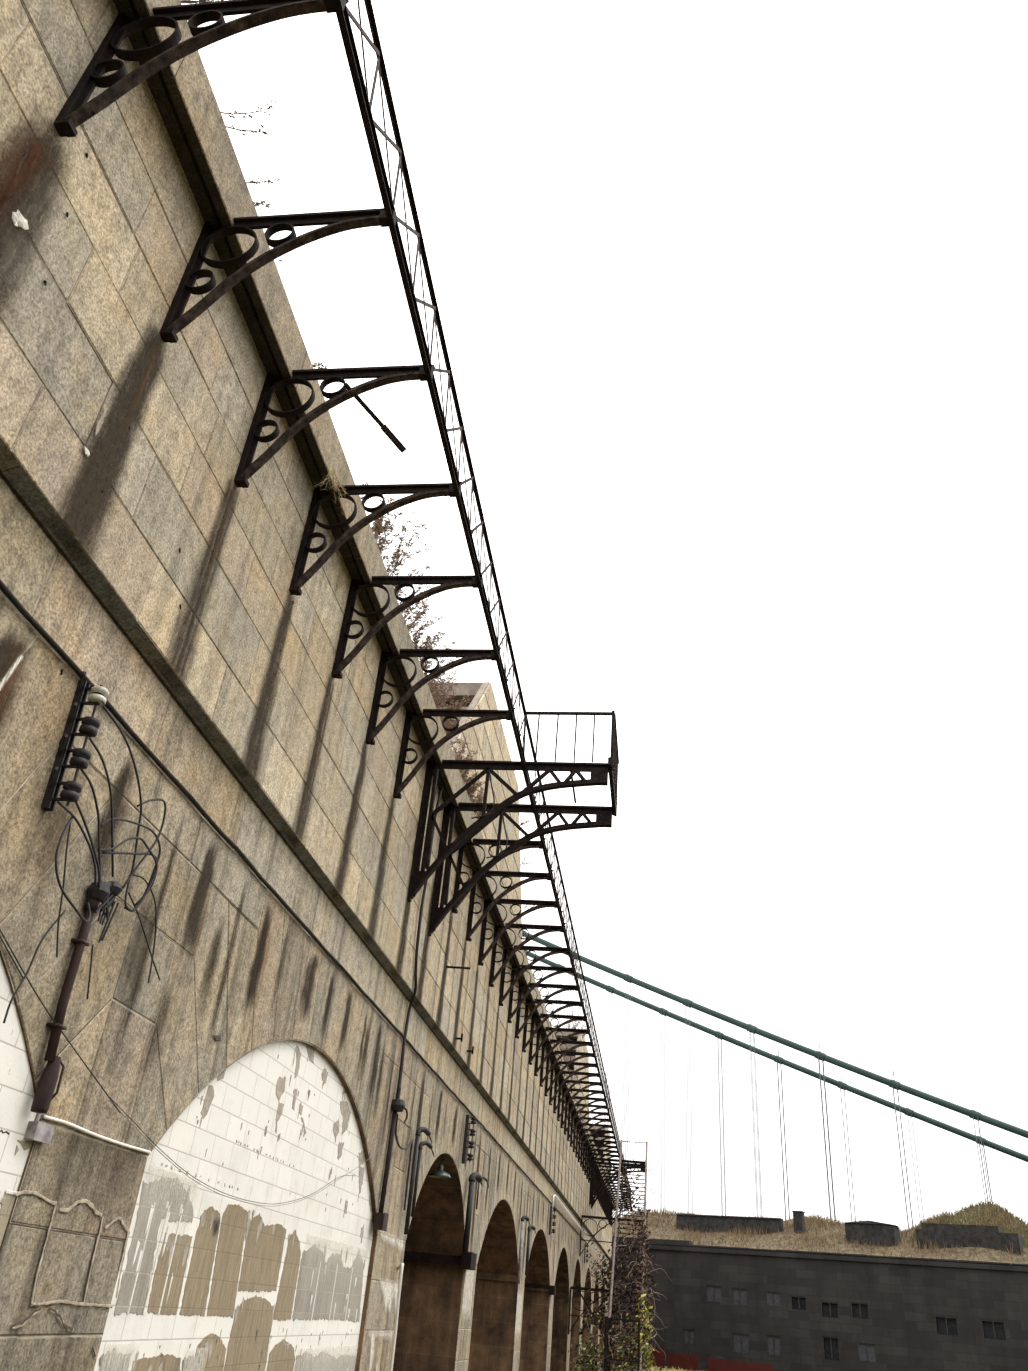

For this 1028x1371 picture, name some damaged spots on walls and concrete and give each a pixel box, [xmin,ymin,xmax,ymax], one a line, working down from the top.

peeling [196,1069,226,1128]
peeling [236,1043,328,1167]
peeling [14,1140,33,1156]
peeling [0,1190,17,1246]
peeling [99,1088,372,1371]